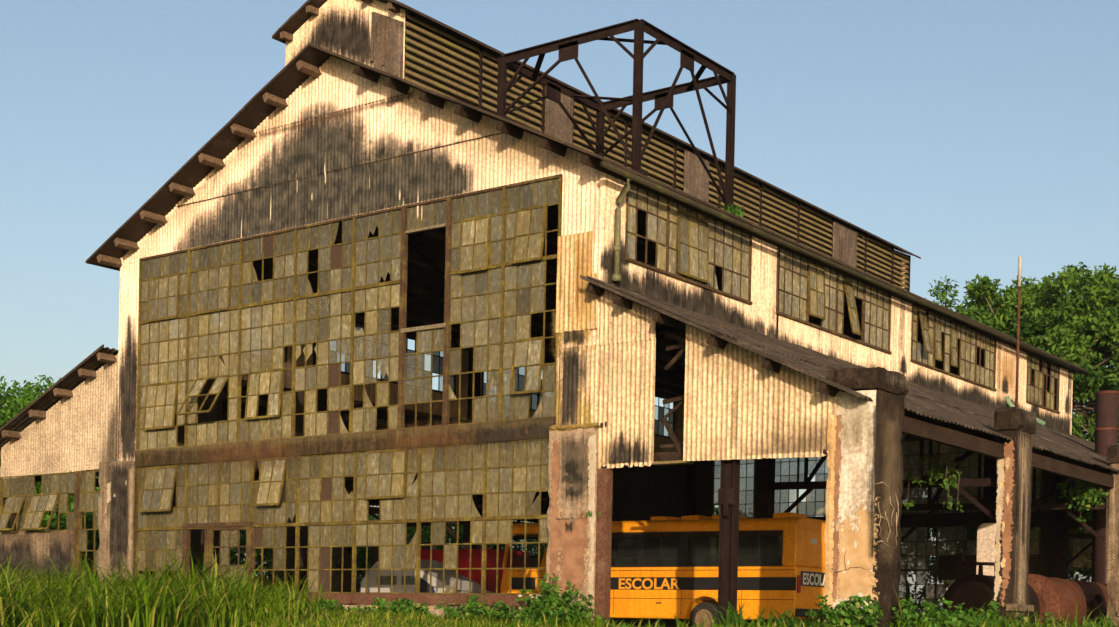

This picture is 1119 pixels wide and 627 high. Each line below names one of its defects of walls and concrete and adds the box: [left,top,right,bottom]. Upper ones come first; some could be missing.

damp [291,9,373,67]
damp [177,104,473,251]
damp [102,317,138,574]
damp [476,330,592,500]
flaking render [829,415,879,602]
flaking render [994,438,1016,607]